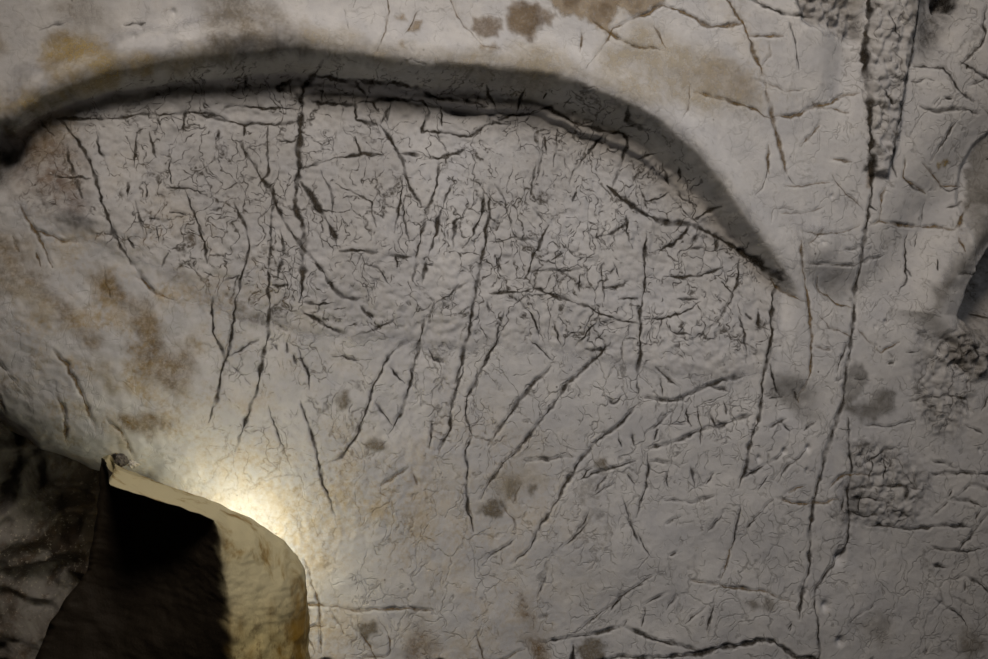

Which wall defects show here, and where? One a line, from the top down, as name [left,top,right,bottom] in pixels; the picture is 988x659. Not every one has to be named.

damp [473,0,664,39]
crack [860,0,988,154]
crack [16,208,69,266]
crack [57,70,525,439]
crack [301,406,332,508]
crack [340,325,442,458]
crack [429,90,988,659]
crack [308,573,427,658]